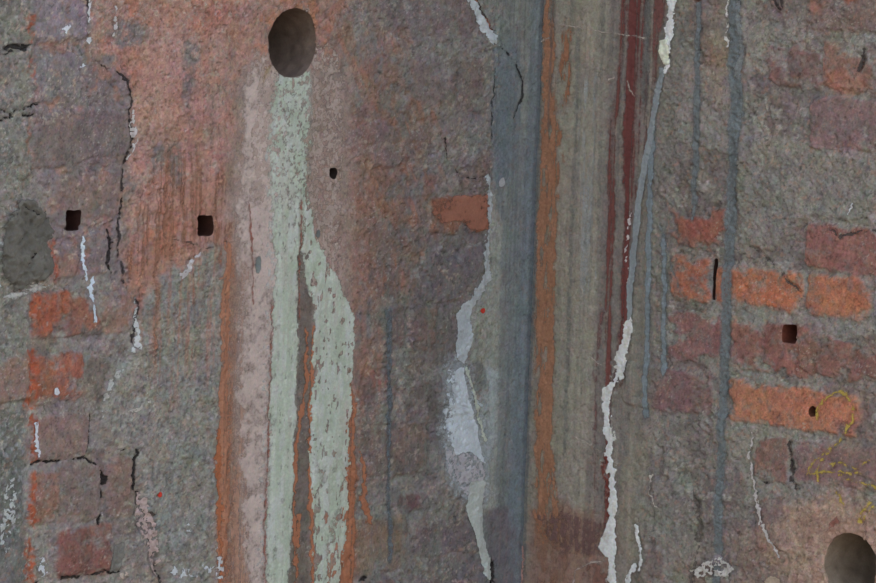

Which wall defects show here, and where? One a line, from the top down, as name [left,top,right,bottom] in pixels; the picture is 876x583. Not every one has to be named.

crack [86,0,118,44]
crack [467,0,524,137]
crack [30,64,143,525]
crack [121,449,162,583]
corrosion [263,305,273,582]
damp [235,40,355,583]
corrosion [292,325,315,583]
corrosion [340,384,372,583]
peeling [432,174,505,580]
crack [488,559,496,583]
corrosion [532,0,572,557]
crack [572,0,677,583]